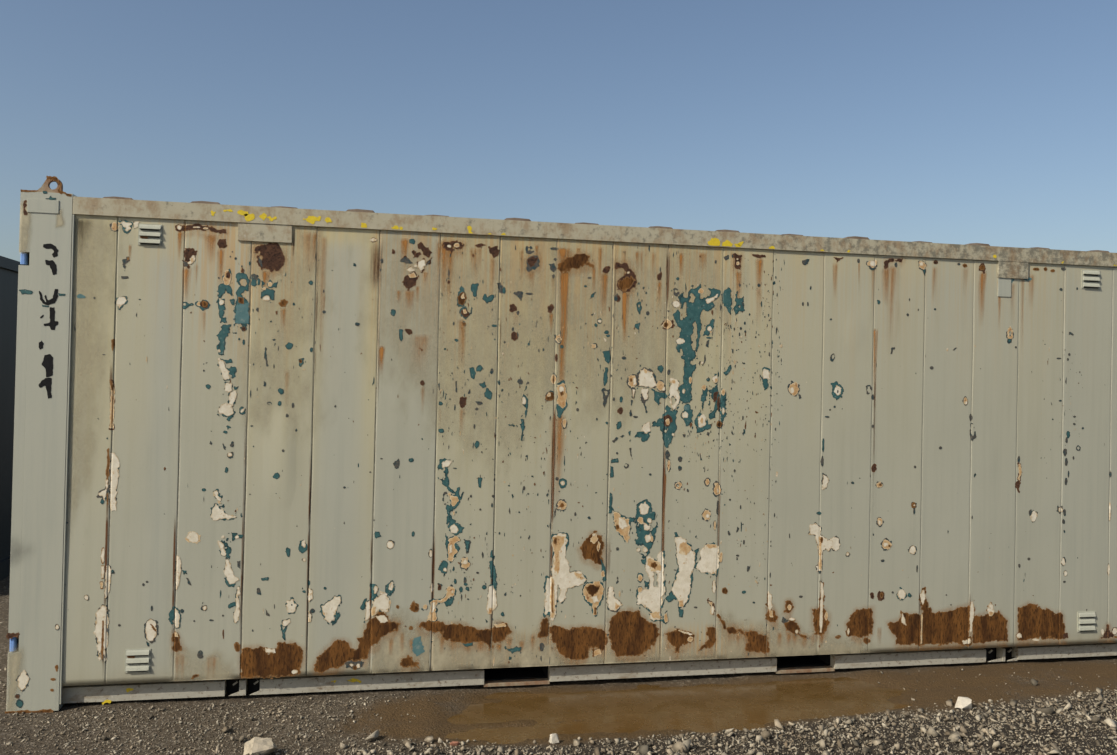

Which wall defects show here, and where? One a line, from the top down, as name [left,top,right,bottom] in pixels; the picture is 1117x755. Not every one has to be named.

peeling [183,265,278,459]
rust [254,242,294,283]
rust [526,246,638,375]
peeling [591,282,745,490]
peeling [84,547,115,663]
peeling [96,452,120,512]
rust [234,548,512,679]
peeling [421,458,471,622]
peeling [543,477,723,624]
rust [537,581,1068,660]